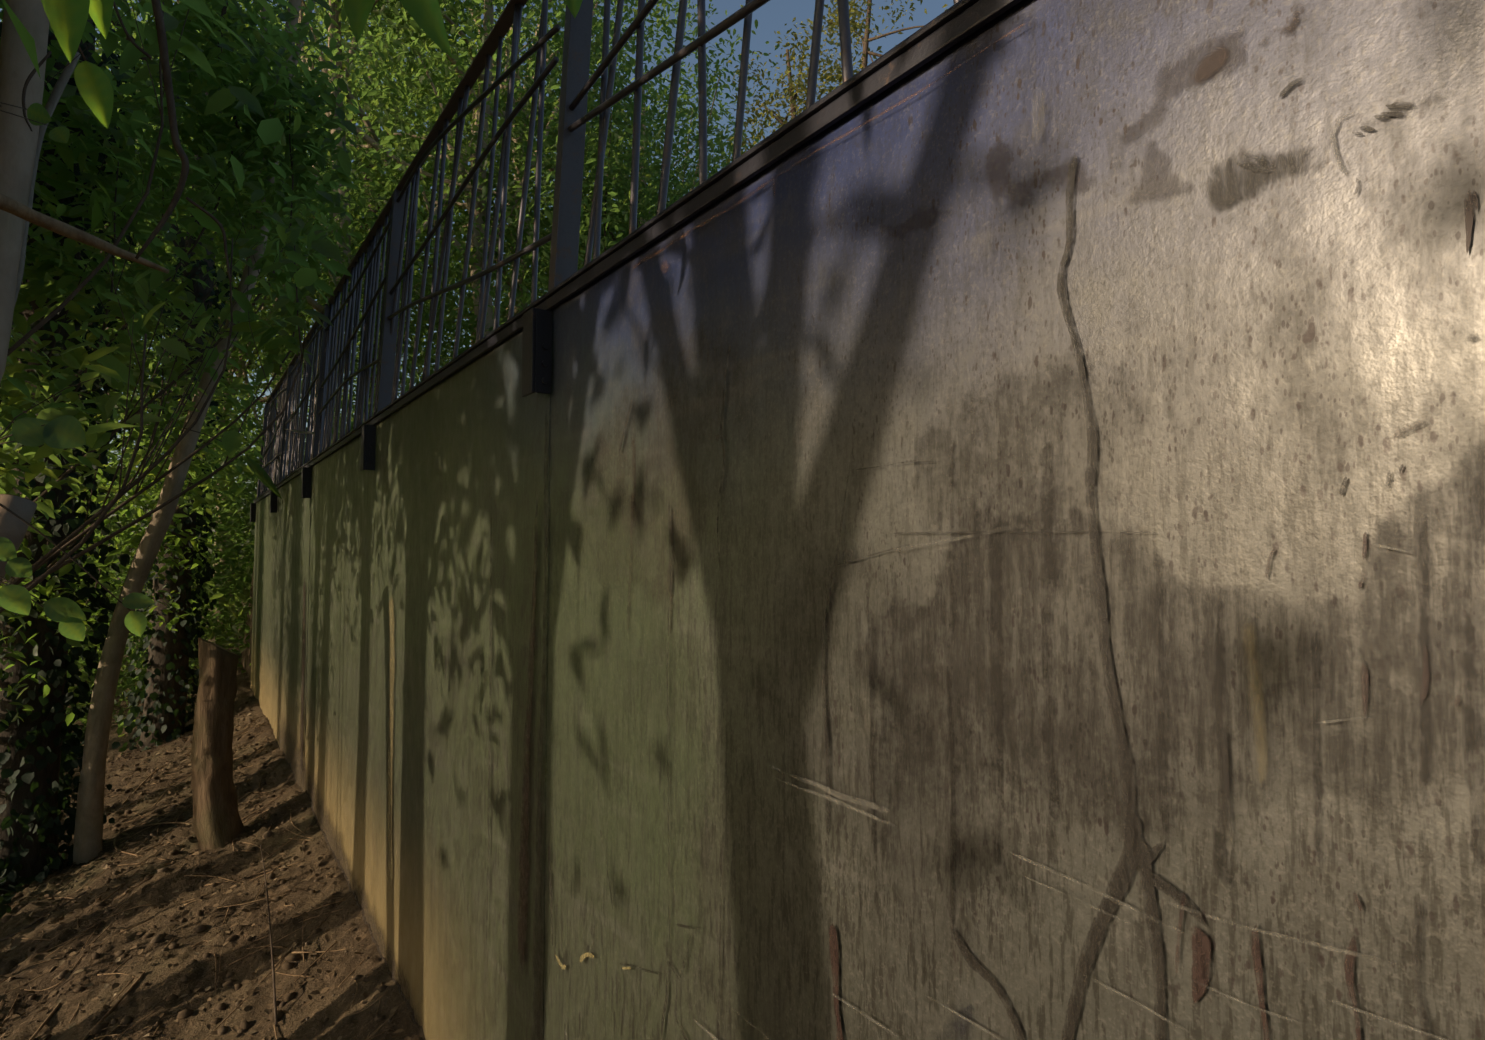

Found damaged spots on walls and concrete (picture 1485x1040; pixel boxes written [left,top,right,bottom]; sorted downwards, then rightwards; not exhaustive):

damp [866,155,1485,1040]
rust [1191,927,1211,1003]